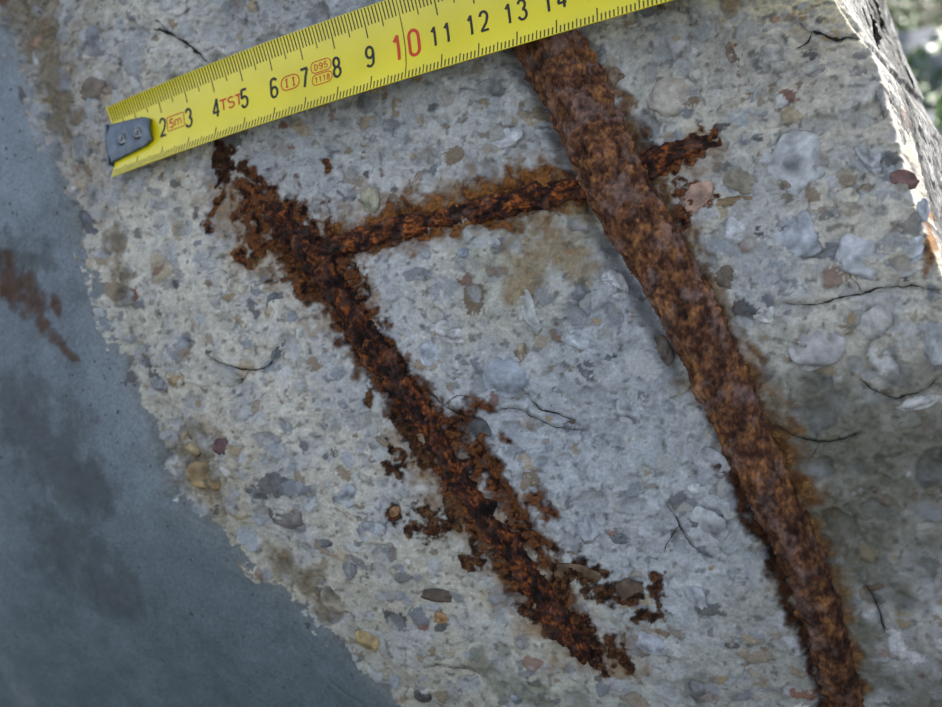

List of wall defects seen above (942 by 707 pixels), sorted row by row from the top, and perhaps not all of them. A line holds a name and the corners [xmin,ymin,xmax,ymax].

crack [797,0,885,49]
spalling [492,127,523,149]
rust [612,87,652,151]
rust [651,124,720,250]
rust [0,251,78,361]
spalling [418,340,438,367]
spalling [430,320,464,344]
spalling [482,357,529,399]
spalling [577,0,942,707]
rust [715,300,852,624]
spalling [573,515,599,544]
rust [713,463,828,707]